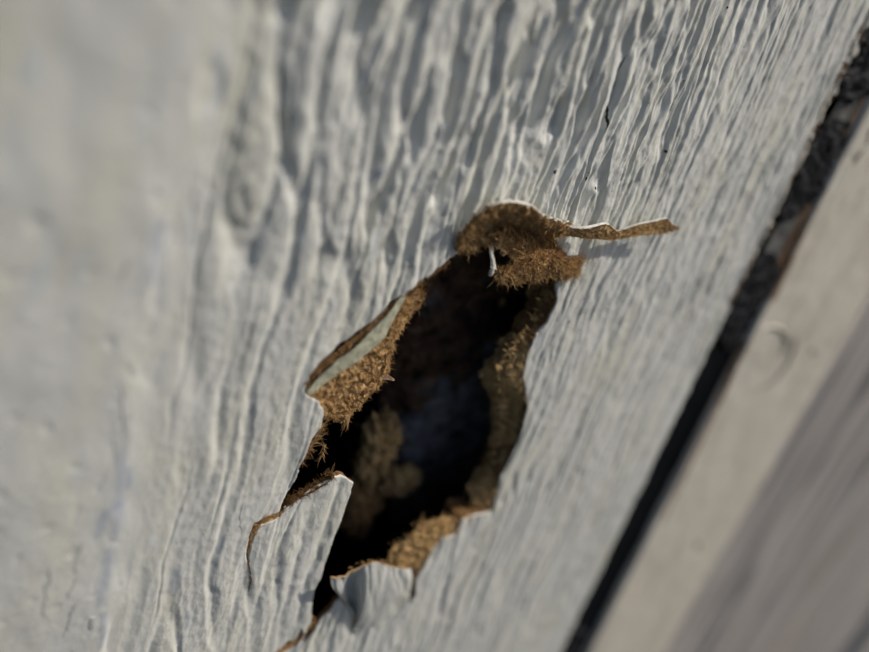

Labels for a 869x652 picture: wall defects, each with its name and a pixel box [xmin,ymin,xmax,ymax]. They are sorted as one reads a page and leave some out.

peeling [452,197,679,292]
spalling [317,323,370,366]
spalling [283,389,381,501]
spalling [311,496,444,631]